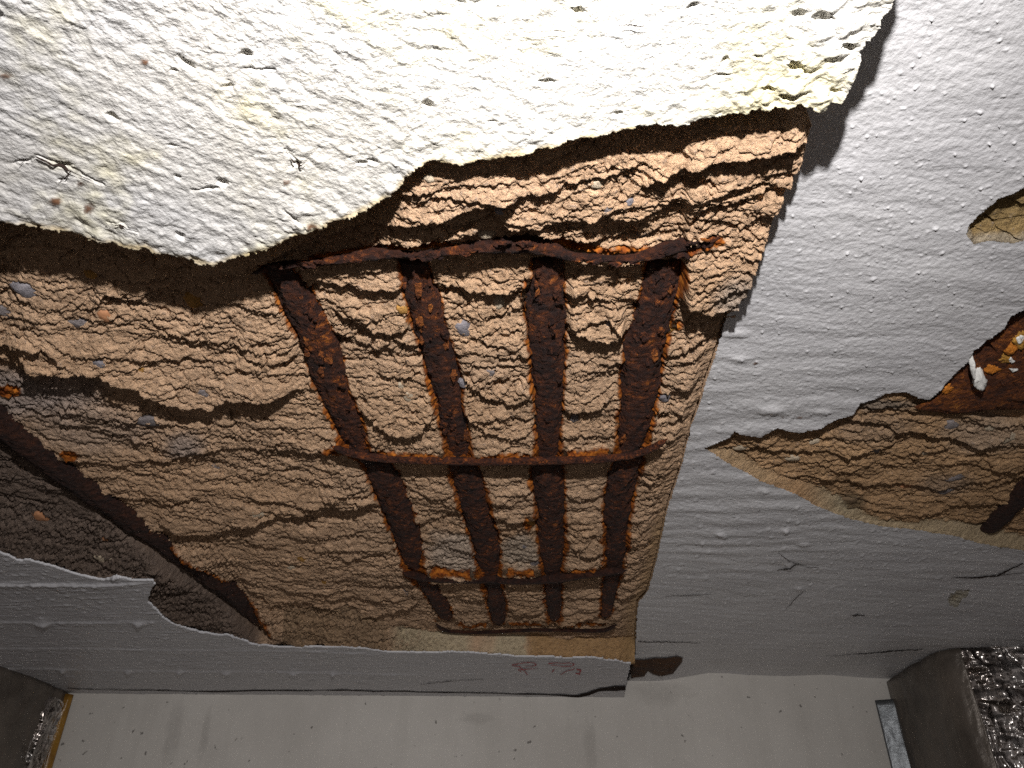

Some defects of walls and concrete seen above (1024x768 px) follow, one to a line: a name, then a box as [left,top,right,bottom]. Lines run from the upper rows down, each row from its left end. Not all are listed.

spalling [966,188,1024,244]
spalling [0,104,812,664]
rust [258,237,725,629]
spalling [705,392,1024,551]
peeling [968,355,988,391]
rust [984,330,1024,375]